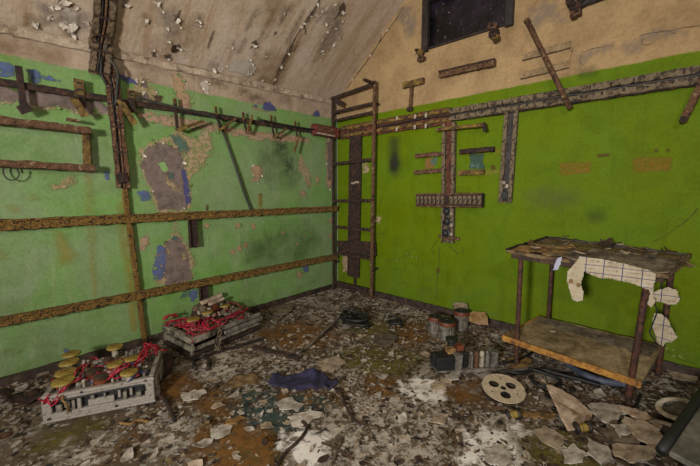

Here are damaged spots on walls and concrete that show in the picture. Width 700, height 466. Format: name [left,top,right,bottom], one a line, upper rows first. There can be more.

peeling [47,0,89,40]
peeling [152,1,183,61]
peeling [311,3,346,55]
peeling [0,61,15,77]
peeling [0,69,109,117]
peeling [119,73,312,302]